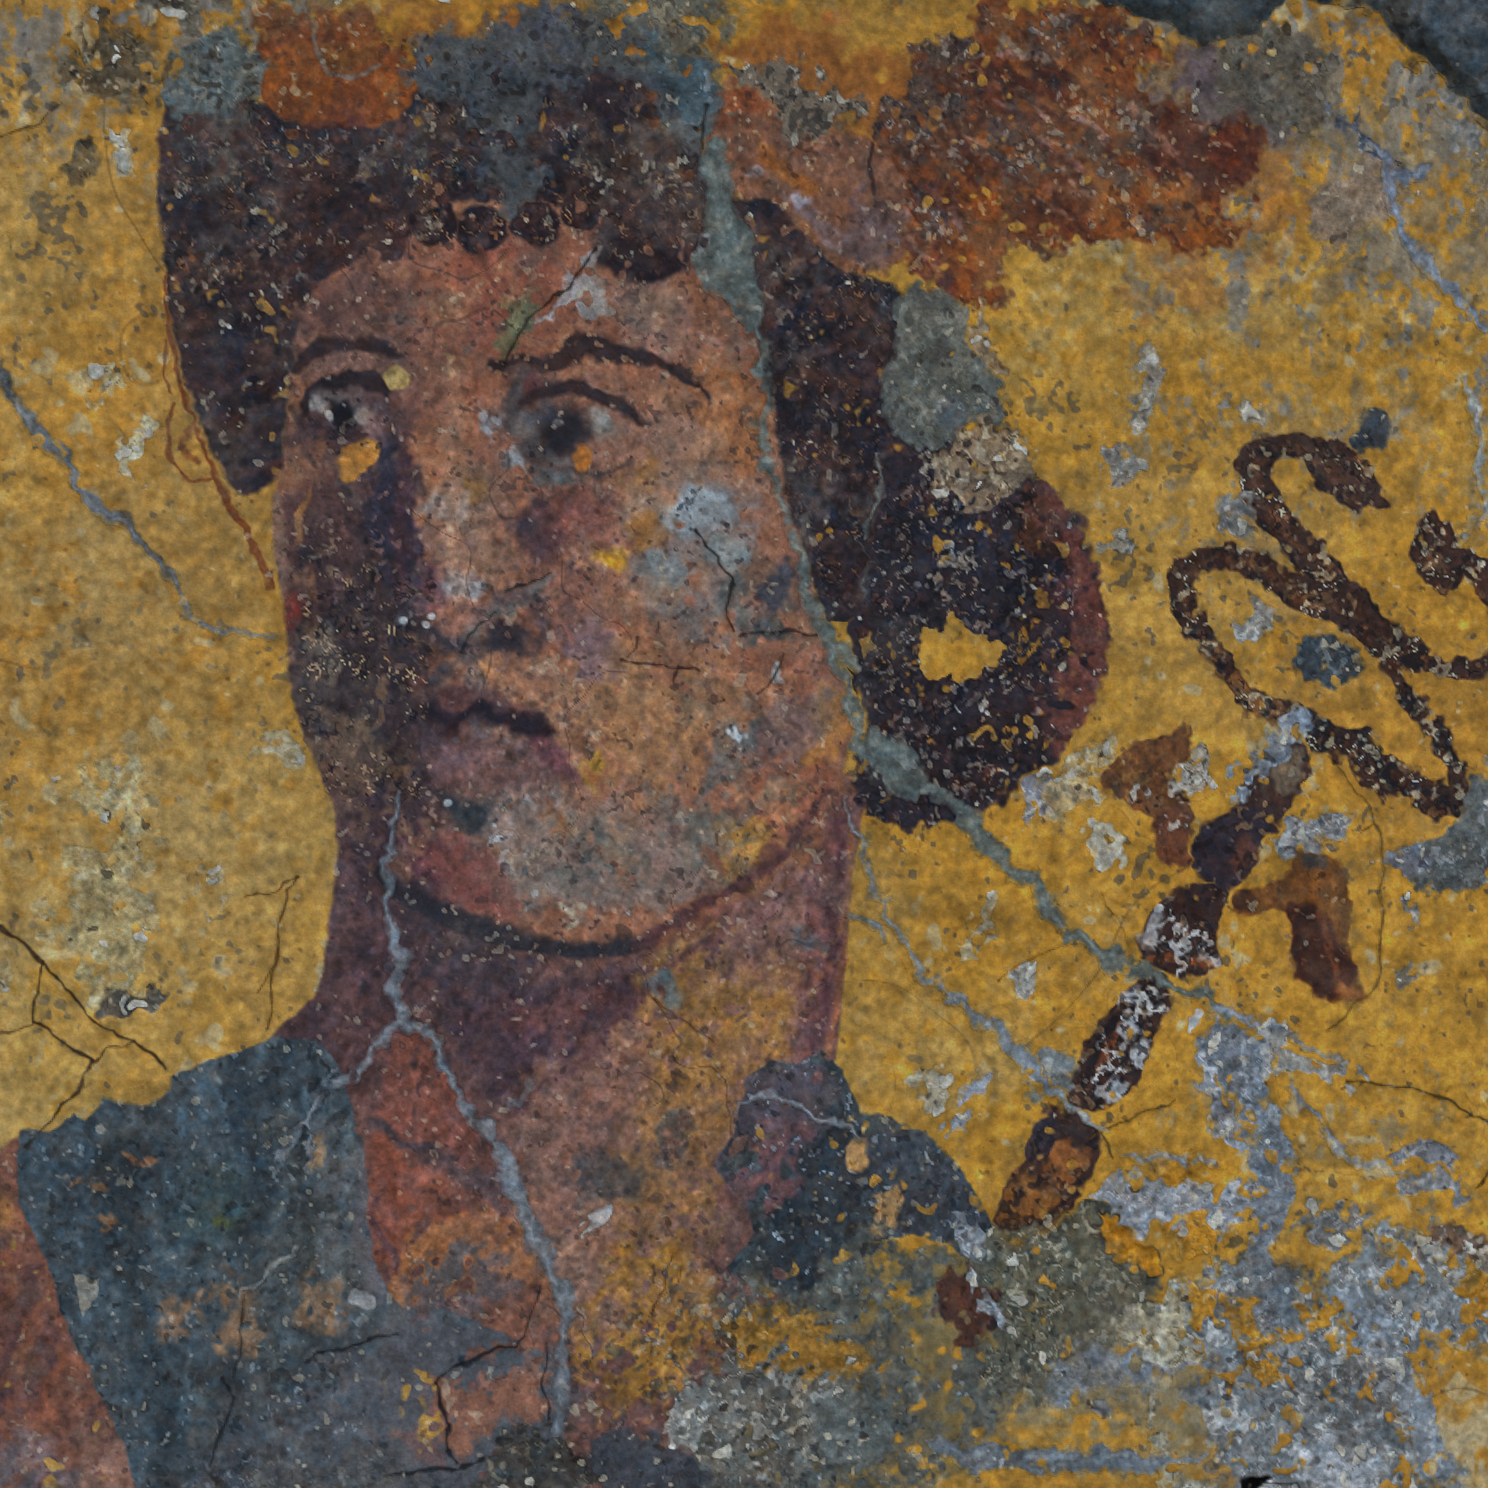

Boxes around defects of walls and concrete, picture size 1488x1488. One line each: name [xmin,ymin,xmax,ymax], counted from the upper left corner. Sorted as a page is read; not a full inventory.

flaking render [53,0,248,189]
crack [0,359,278,642]
crack [689,101,1488,1215]
crack [0,924,169,1148]
crack [244,875,302,1032]
crack [272,788,579,1478]
flaking render [903,1041,1082,1140]
flaking render [1005,959,1038,1001]
flaking render [1380,841,1436,932]
crack [209,1244,299,1464]
flaking render [662,1284,893,1488]
flaking render [943,1007,1488,1488]